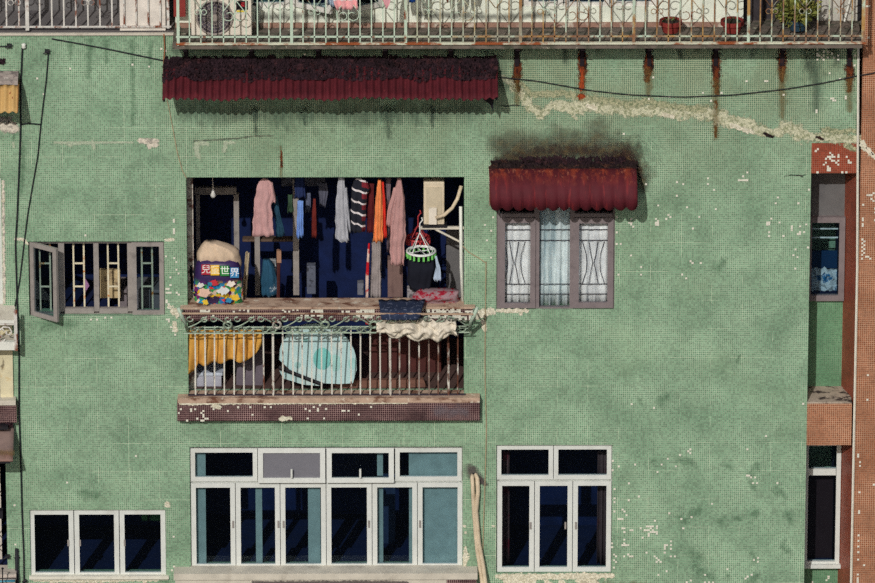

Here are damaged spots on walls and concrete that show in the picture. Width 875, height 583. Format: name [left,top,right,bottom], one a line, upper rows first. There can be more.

corrosion [512,49,524,92]
corrosion [577,49,587,100]
corrosion [643,48,654,82]
corrosion [711,48,723,109]
corrosion [776,52,788,82]
corrosion [845,58,855,93]
flaking render [499,75,875,173]
leakage [498,135,646,190]
flaking render [422,307,529,332]
flaking render [178,403,407,422]